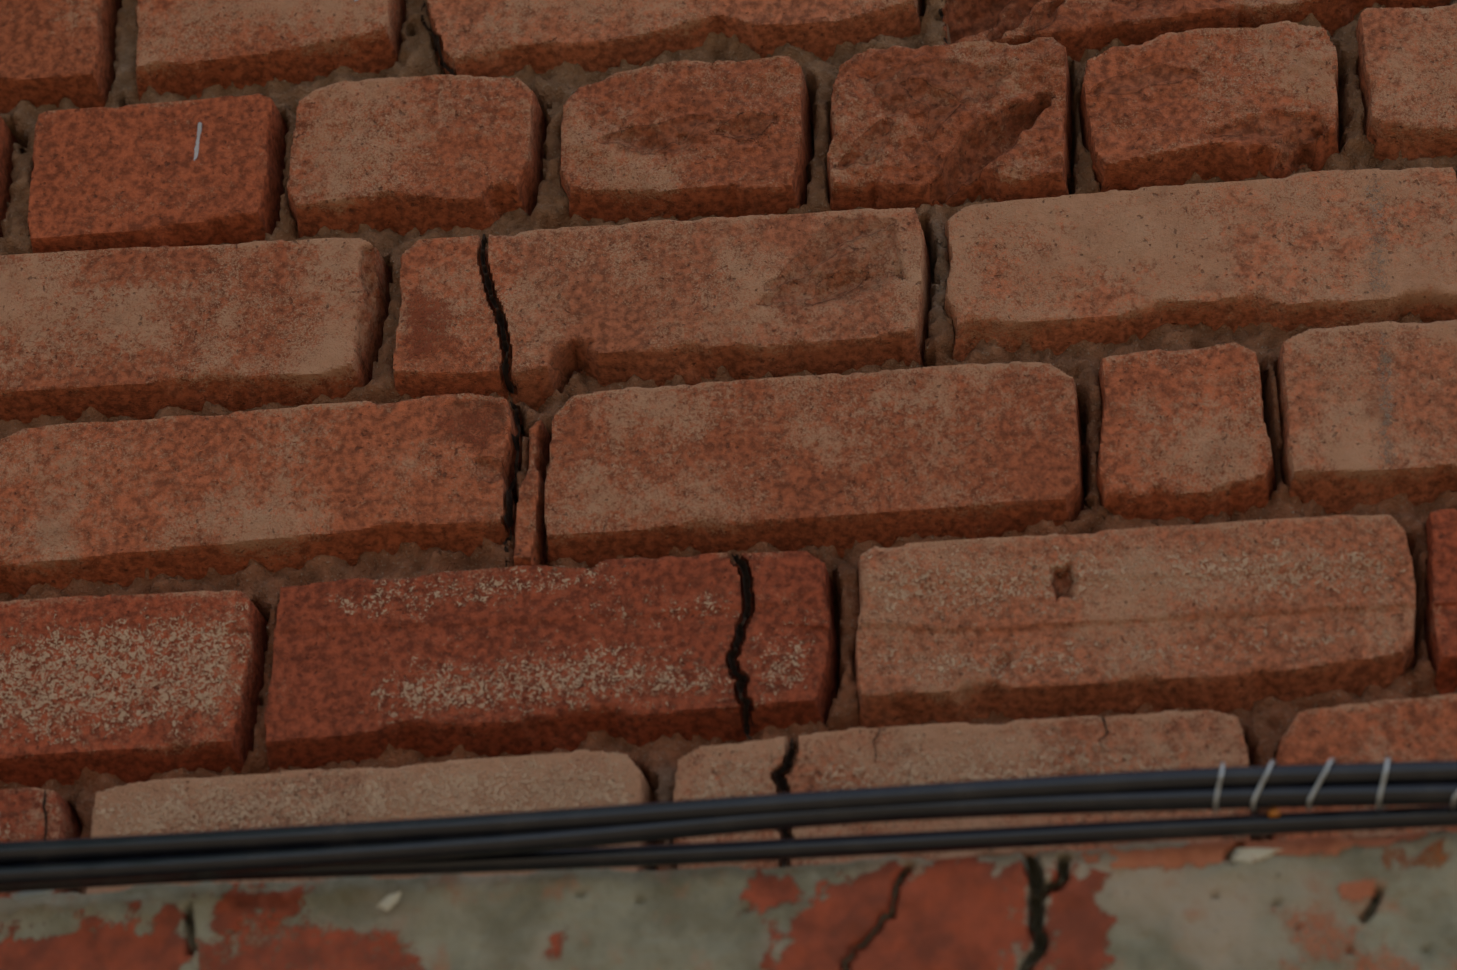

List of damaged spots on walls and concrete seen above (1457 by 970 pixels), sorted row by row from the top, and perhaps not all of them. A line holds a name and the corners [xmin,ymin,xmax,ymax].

spalling [834,0,1064,169]
spalling [931,94,1054,204]
crack [480,234,521,567]
crack [728,553,752,740]
crack [774,738,795,793]
peeling [0,882,315,970]
peeling [376,892,401,911]
peeling [543,931,568,960]
crack [781,829,791,867]
crack [1023,856,1068,970]
peeling [739,829,1448,970]